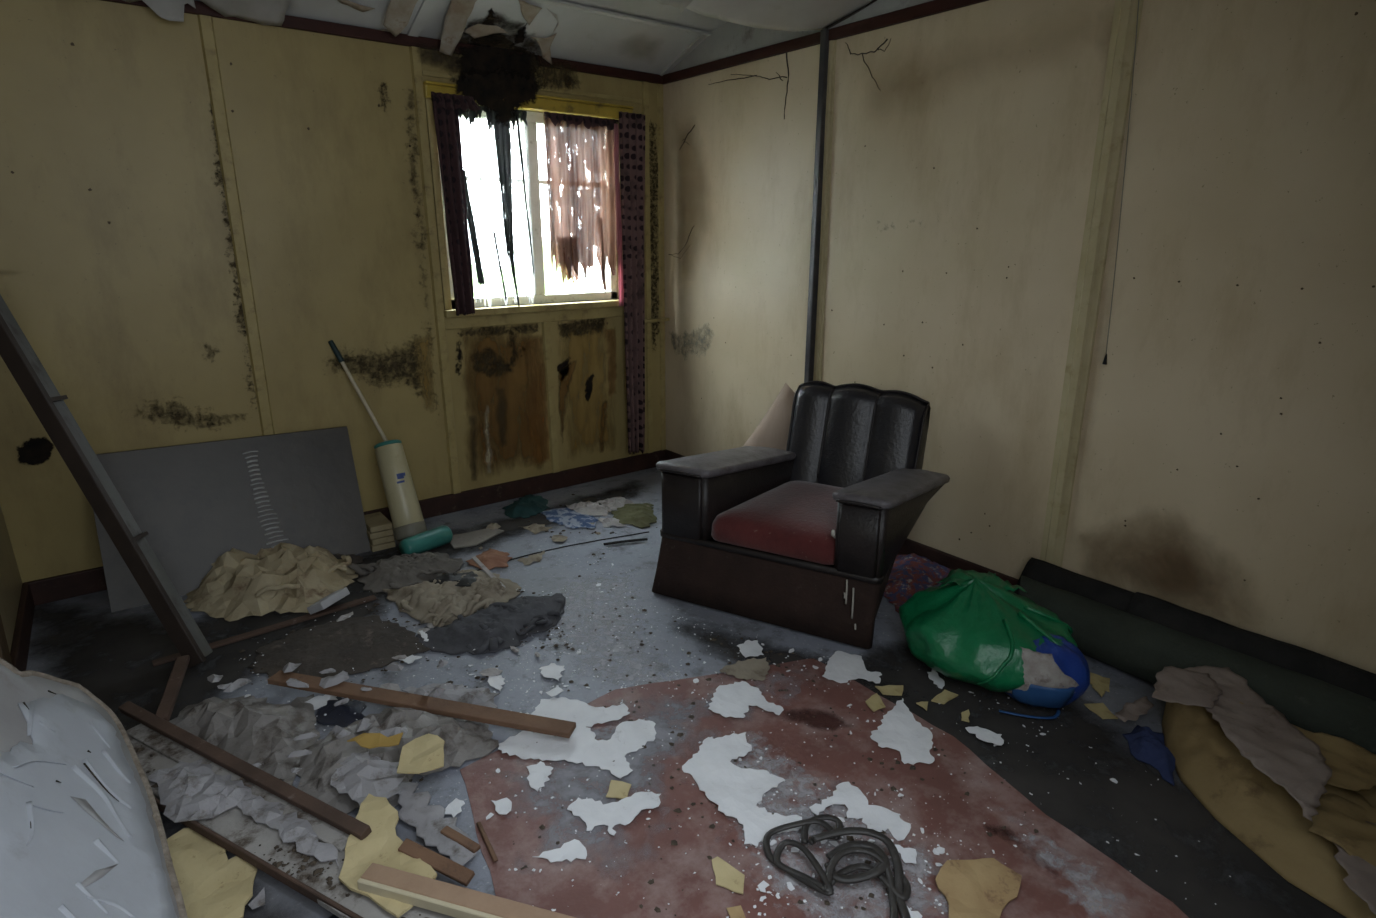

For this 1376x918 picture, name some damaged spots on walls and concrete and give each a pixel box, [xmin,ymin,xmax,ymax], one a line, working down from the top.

crack [708,53,789,119]
crack [825,0,891,91]
damp [210,105,248,345]
spalling [17,437,54,465]
damp [138,402,238,427]
damp [330,328,432,407]
damp [456,318,616,476]
spalling [0,658,188,918]